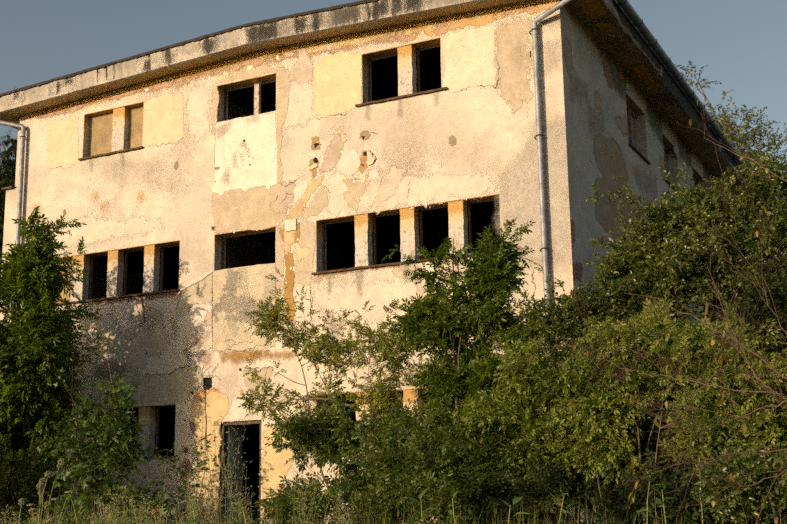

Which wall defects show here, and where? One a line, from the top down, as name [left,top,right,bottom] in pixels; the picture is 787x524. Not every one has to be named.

flaking render [20,0,583,324]
damp [20,0,691,163]
flaking render [593,134,634,246]
spalling [603,0,663,76]
damp [212,270,275,336]
flaking render [66,305,273,508]